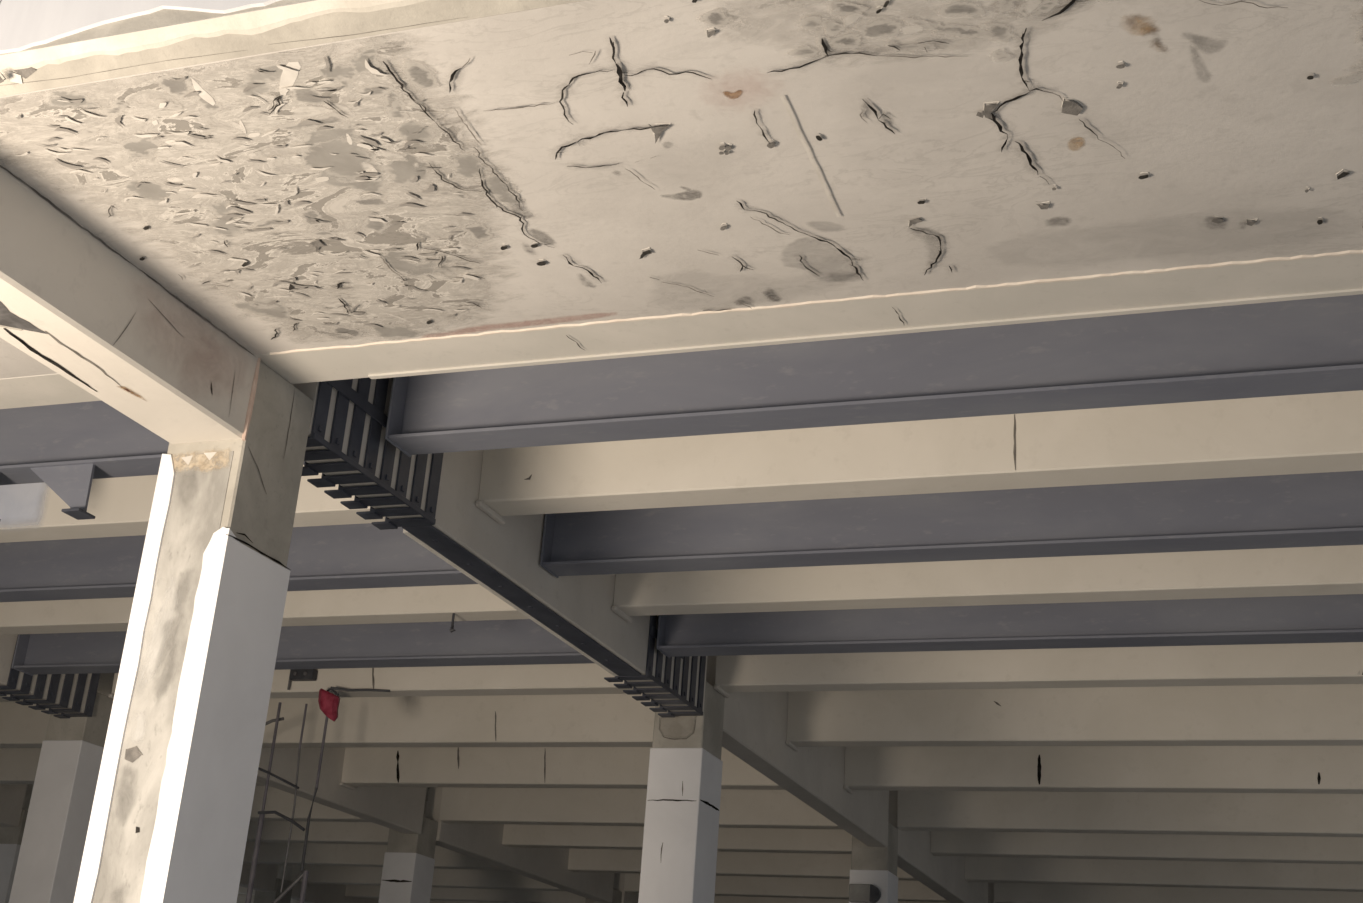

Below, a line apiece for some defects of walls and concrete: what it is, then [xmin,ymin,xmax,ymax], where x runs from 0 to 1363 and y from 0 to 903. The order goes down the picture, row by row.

crack [1200,0,1286,8]
peeling [0,35,525,340]
crack [0,17,710,281]
crack [860,99,895,134]
crack [989,0,1124,184]
crack [0,165,297,413]
crack [737,201,863,280]
crack [910,228,952,275]
crack [648,781,719,811]
crack [1035,755,1043,784]